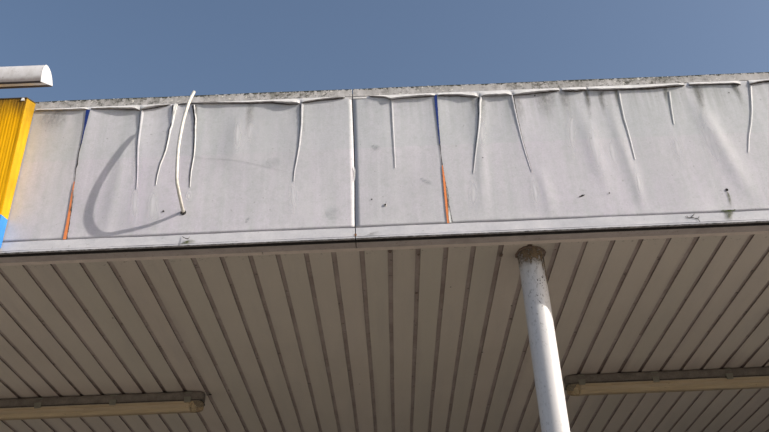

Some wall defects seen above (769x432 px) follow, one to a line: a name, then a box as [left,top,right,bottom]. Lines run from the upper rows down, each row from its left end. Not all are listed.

crack [136,103,197,189]
crack [293,103,304,181]
crack [473,96,483,173]
crack [510,94,532,172]
crack [617,90,636,159]
crack [746,85,754,152]